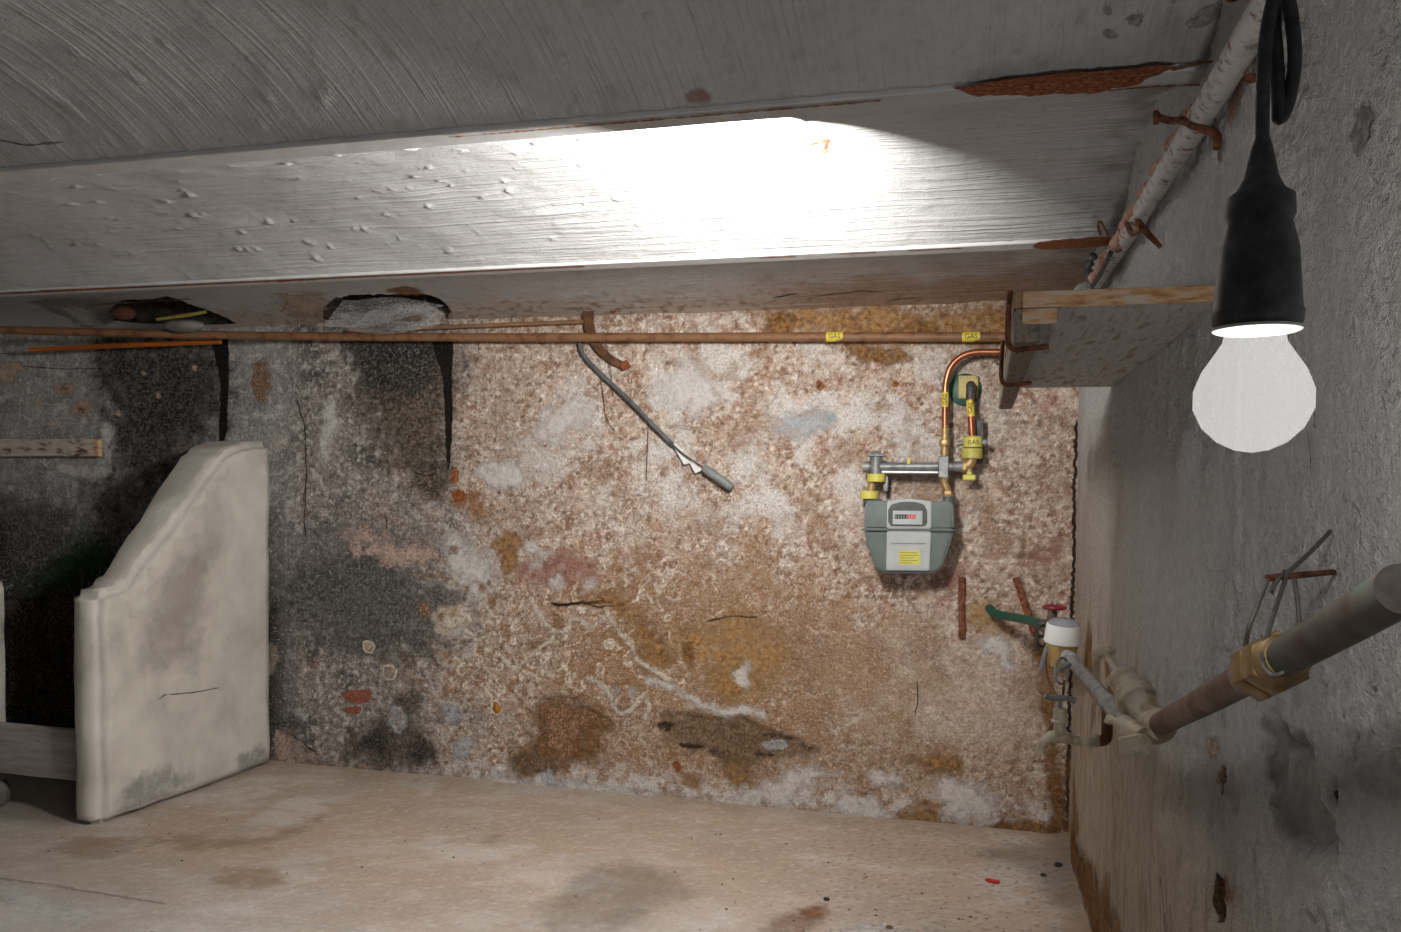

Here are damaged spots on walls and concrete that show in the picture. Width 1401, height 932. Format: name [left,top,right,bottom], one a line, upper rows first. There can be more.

rust [955,60,1213,97]
rust [1033,103,1193,283]
damp [765,306,1006,366]
damp [433,342,454,469]
damp [660,363,717,416]
damp [474,461,522,489]
damp [445,531,521,608]
damp [281,557,488,664]
mould [344,689,434,768]
damp [492,582,837,806]
damp [837,642,1078,834]
flaking render [1212,873,1231,923]